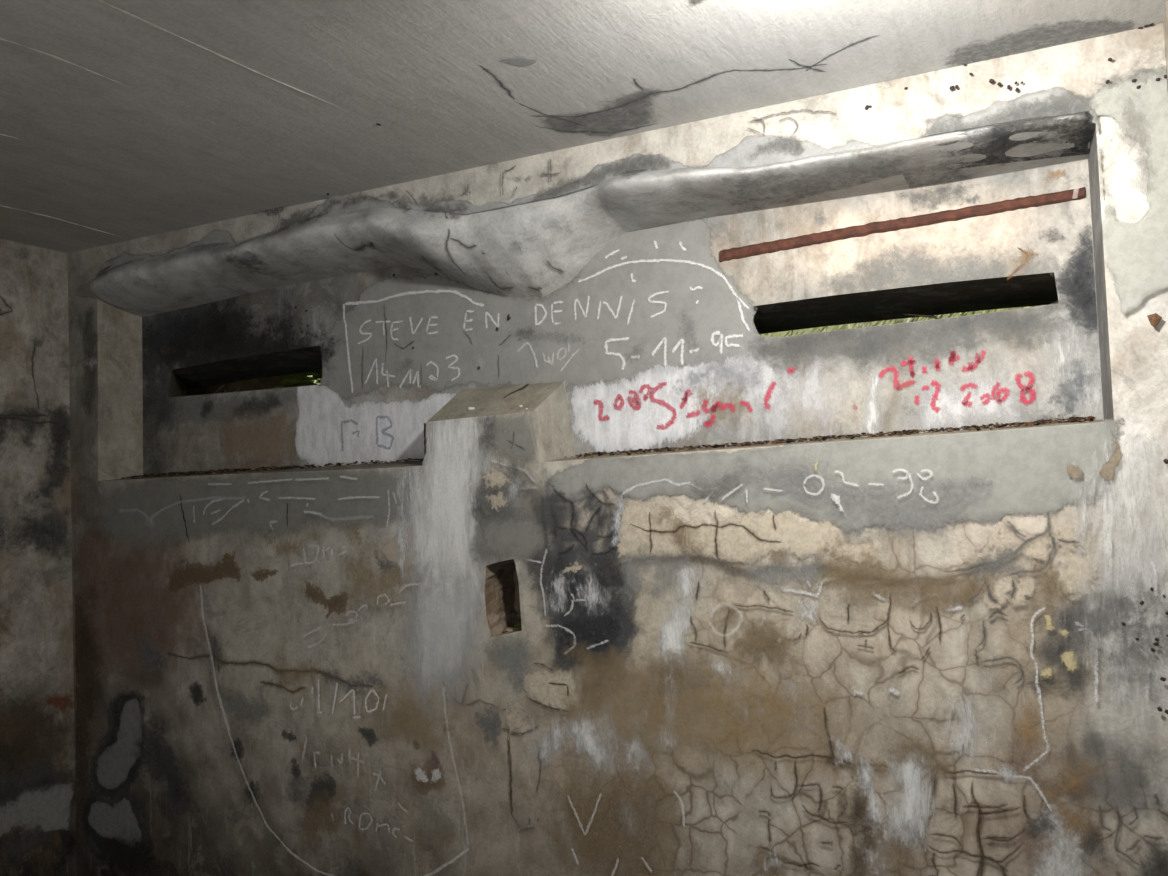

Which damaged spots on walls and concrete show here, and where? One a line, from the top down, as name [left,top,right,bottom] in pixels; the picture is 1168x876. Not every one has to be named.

crack [480,36,876,136]
crack [501,159,559,196]
crack [334,233,373,251]
crack [445,185,563,296]
water stain [0,406,72,559]
crack [168,637,383,694]
water stain [387,415,990,876]
crack [619,514,1080,684]
water stain [948,436,1168,876]
crack [752,708,891,871]
crack [916,766,1040,876]
crack [1090,795,1168,876]